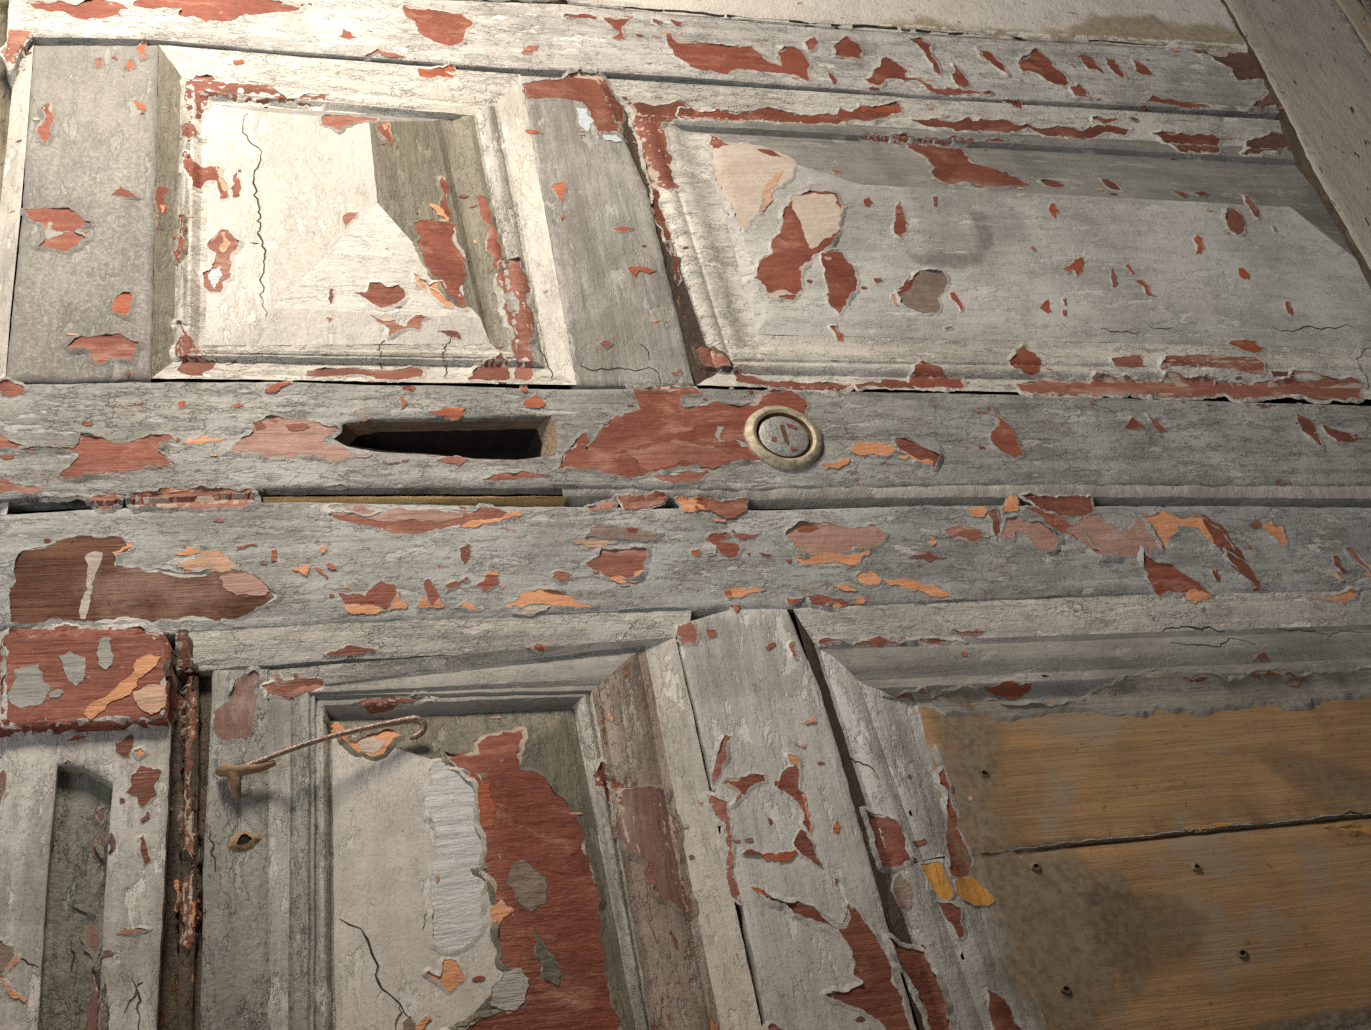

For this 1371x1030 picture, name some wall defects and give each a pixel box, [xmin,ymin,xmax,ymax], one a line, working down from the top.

peeling [0,29,34,74]
peeling [21,0,311,25]
crack [242,113,267,317]
peeling [518,13,1287,342]
peeling [324,174,548,410]
peeling [907,490,1265,613]
peeling [0,344,985,1030]
peeling [882,651,1371,722]
peeling [859,764,996,942]
crack [891,810,1371,867]
crack [339,918,409,1030]
peeling [985,988,1023,1030]